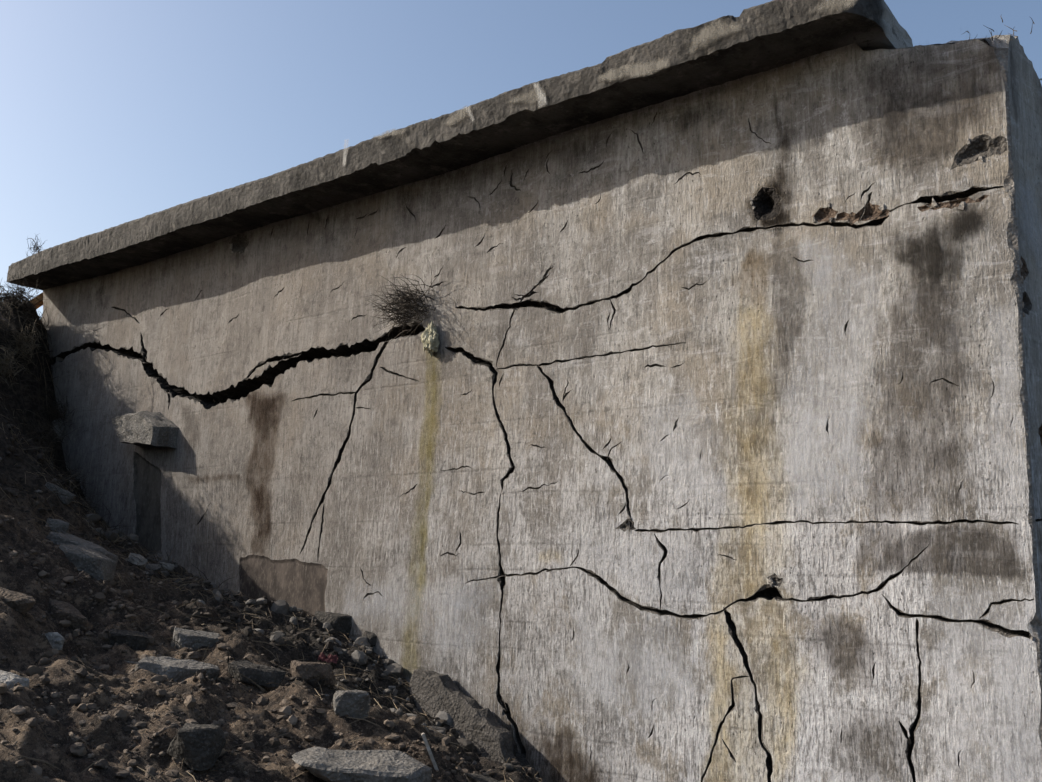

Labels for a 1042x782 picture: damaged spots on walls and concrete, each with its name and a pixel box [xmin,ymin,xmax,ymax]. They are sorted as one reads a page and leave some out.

spalling [950,134,1008,170]
spalling [750,186,781,221]
spalling [810,201,890,225]
spalling [917,195,989,212]
spalling [1019,256,1032,317]
crack [50,306,425,563]
crack [445,186,1042,782]